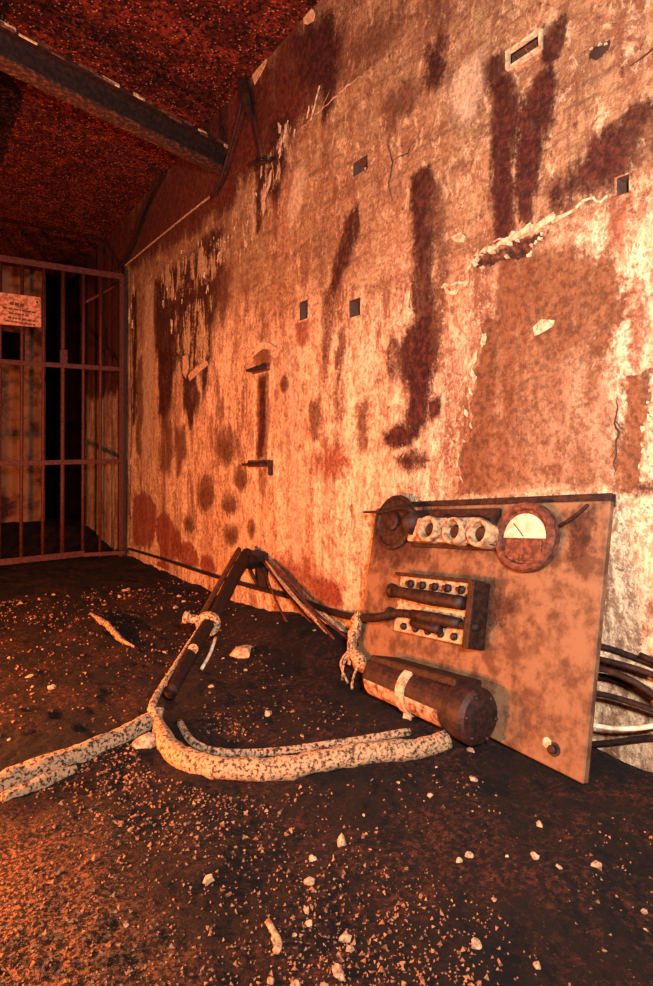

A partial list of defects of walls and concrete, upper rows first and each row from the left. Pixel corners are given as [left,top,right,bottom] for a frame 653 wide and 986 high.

crack [630,48,653,66]
damp [385,80,414,126]
damp [423,0,653,244]
damp [79,11,348,476]
spalling [470,232,544,269]
damp [382,164,449,472]
damp [458,244,653,498]
damp [356,398,368,451]
damp [225,519,254,547]